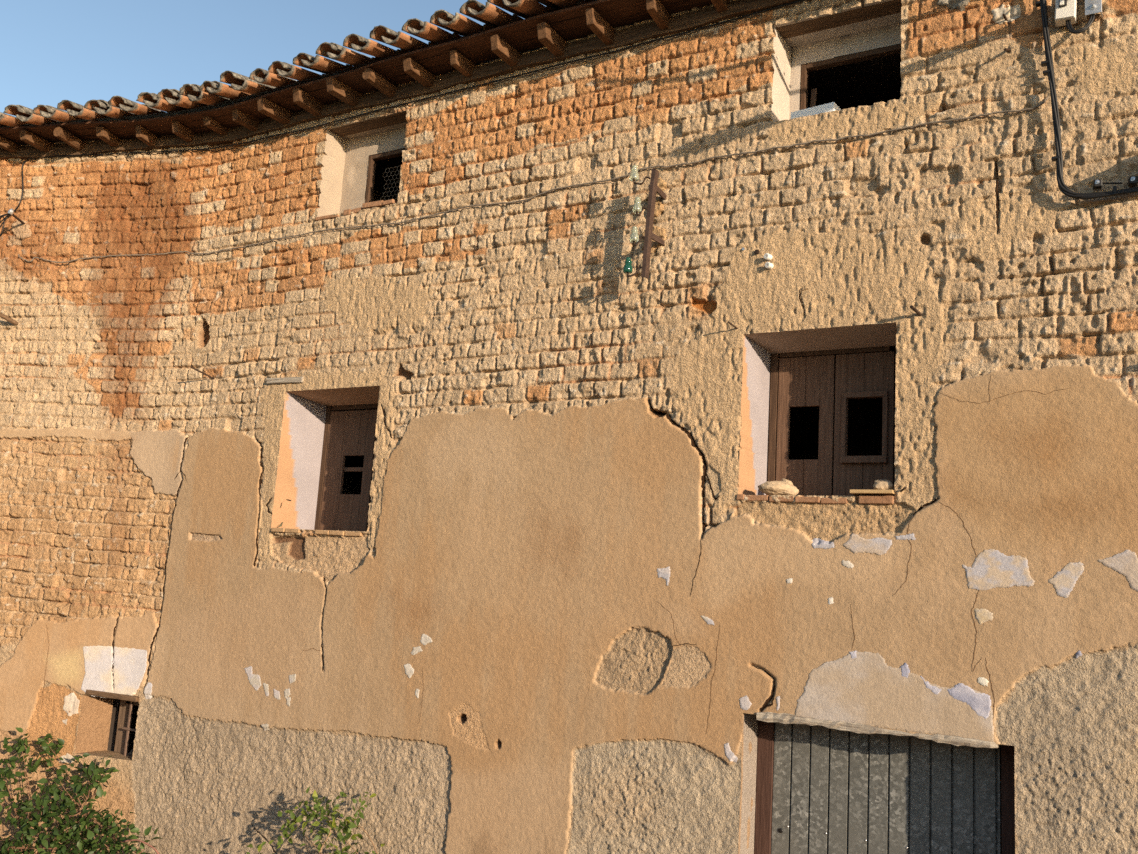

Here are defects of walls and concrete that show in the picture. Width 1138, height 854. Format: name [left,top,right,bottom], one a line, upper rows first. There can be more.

crack [649,401,721,595]
spalling [734,499,916,568]
peeling [962,549,1084,598]
peeling [1099,550,1138,591]
peeling [404,634,432,698]
spalling [595,626,711,694]
crack [658,602,720,732]
crack [753,665,775,712]
spalling [27,646,502,854]
spalling [795,645,1138,854]
spalling [568,739,741,854]